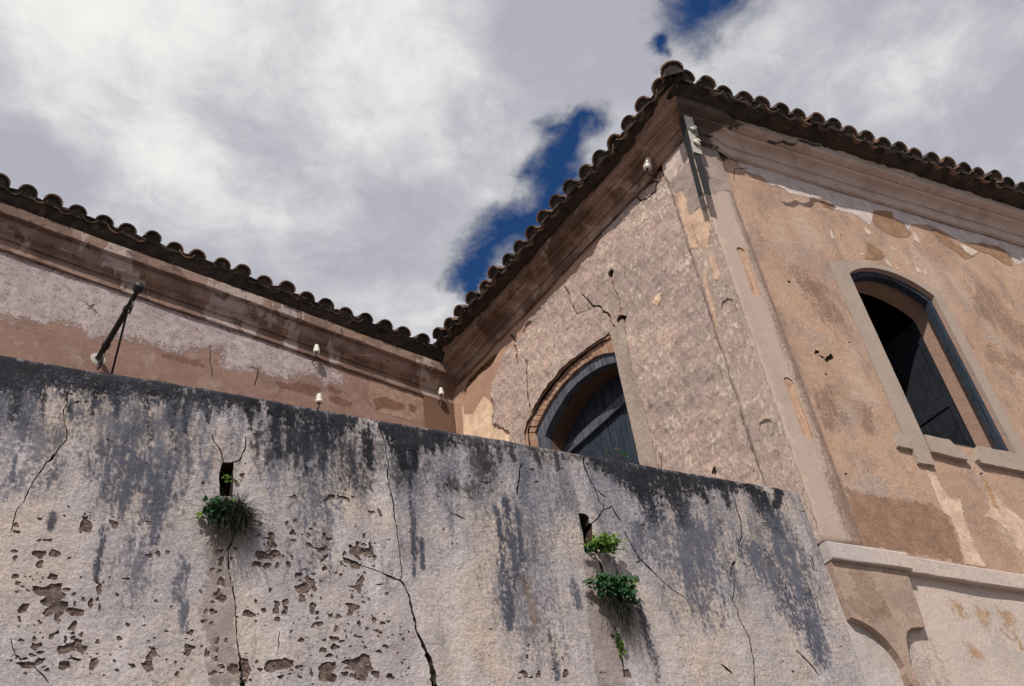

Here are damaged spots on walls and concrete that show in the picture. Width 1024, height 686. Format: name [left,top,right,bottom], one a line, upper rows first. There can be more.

peeling [737,161,1024,275]
crack [11,389,69,531]
leakage [0,375,221,615]
spalling [7,469,410,685]
crack [227,522,245,686]
crack [343,425,438,686]
leakage [408,475,425,576]
peeling [462,353,511,442]
leakage [444,441,560,681]
crack [583,457,686,599]
leakage [628,501,833,683]
peeling [925,470,985,567]